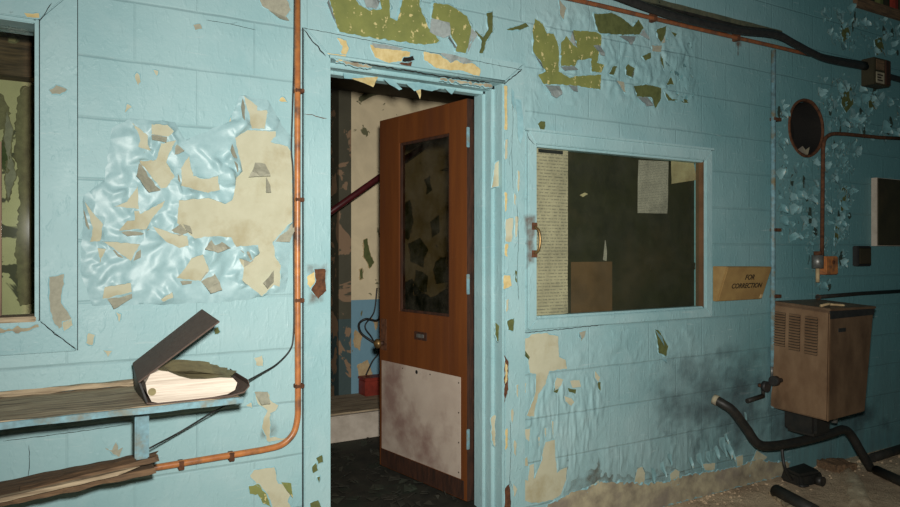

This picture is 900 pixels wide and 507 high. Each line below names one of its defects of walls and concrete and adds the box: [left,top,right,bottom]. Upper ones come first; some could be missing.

peeling [259,0,291,21]
peeling [506,11,695,108]
peeling [327,0,520,257]
peeling [776,73,900,291]
peeling [405,200,449,314]
peeling [246,391,286,443]
peeling [248,466,293,507]
peeling [515,332,581,417]
spalling [490,408,791,507]
spalling [655,329,668,363]